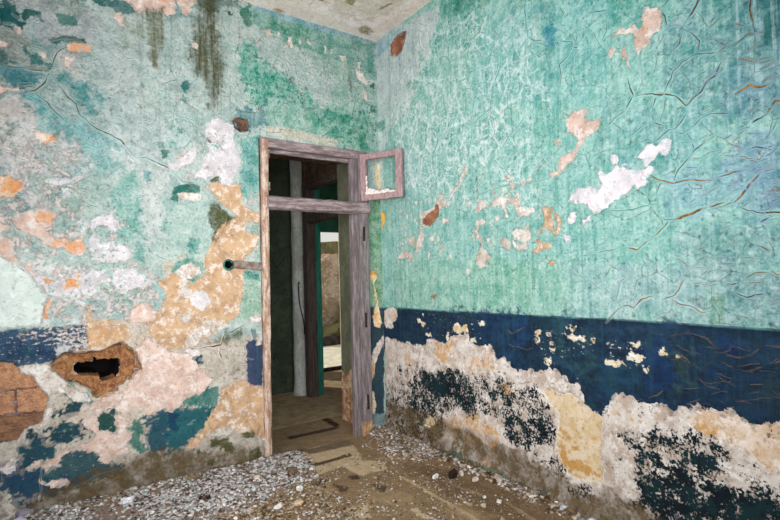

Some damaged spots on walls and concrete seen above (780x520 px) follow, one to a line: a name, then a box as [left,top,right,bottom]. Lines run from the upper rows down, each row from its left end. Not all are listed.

crack [0,222,87,307]
crack [0,3,204,225]
peeling [0,117,265,475]
water stain [146,7,164,67]
peeling [113,0,198,27]
water stain [190,0,224,107]
crack [430,0,578,178]
peeling [465,138,672,275]
peeling [608,6,662,70]
crack [582,0,780,324]
peeling [370,270,780,520]
crack [669,330,780,406]